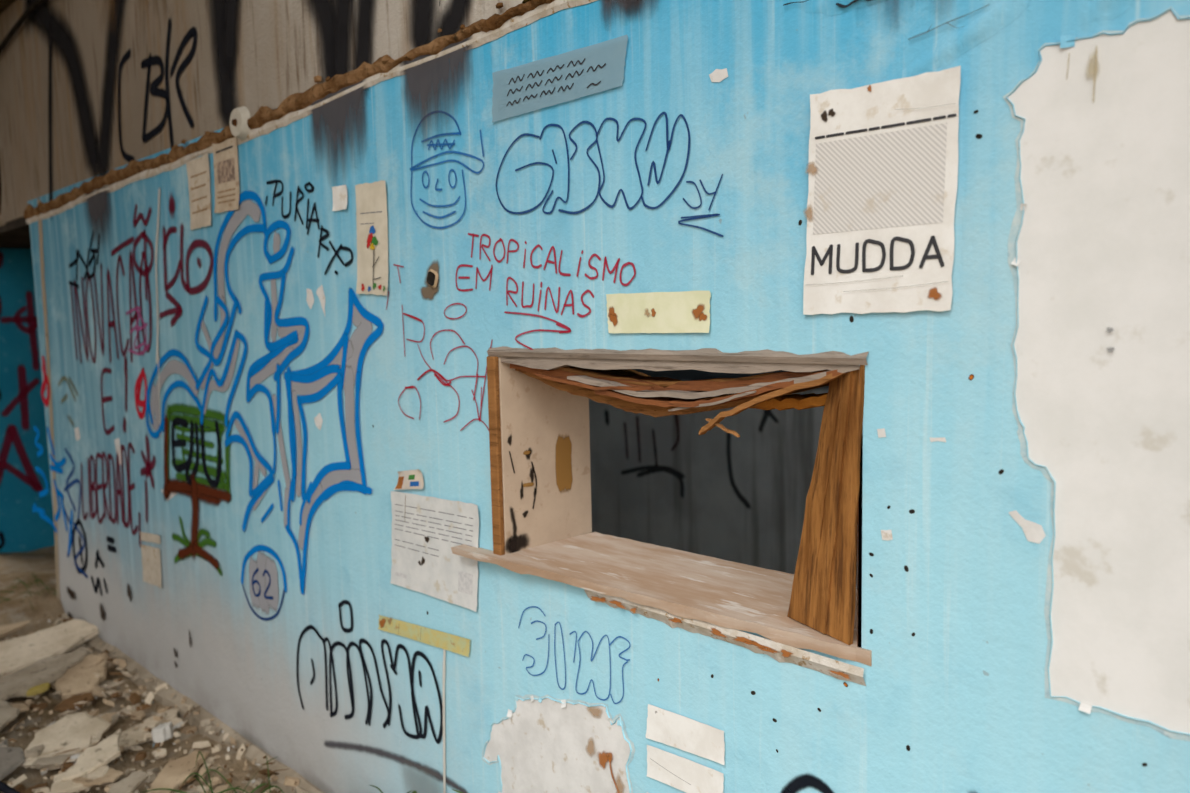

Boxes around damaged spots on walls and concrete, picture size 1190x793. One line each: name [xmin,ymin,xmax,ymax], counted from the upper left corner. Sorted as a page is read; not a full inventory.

peeling [709,68,728,82]
peeling [1003,7,1190,741]
peeling [482,694,635,793]